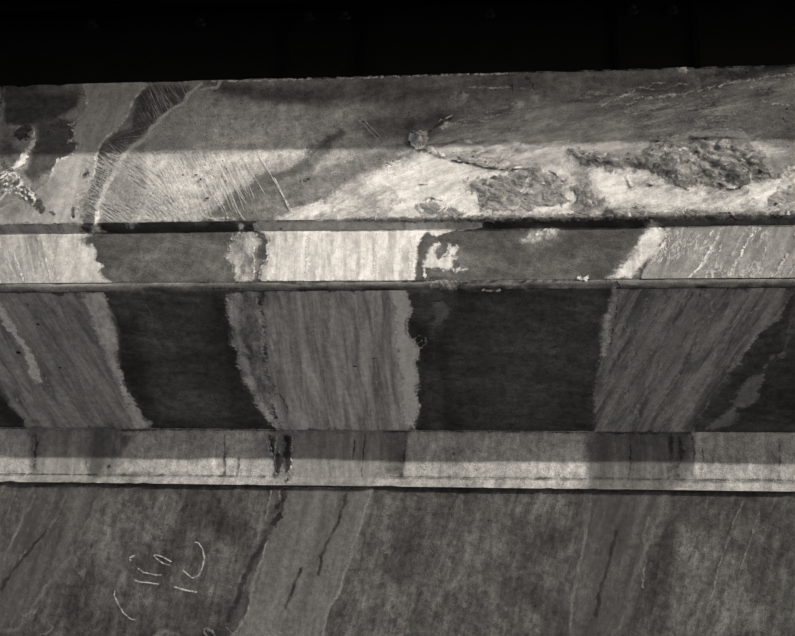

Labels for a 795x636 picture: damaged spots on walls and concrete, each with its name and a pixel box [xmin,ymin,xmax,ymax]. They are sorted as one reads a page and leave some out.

spalling [0,154,56,216]
leakage [0,82,221,630]
leakage [197,72,795,636]
spalling [346,131,795,224]